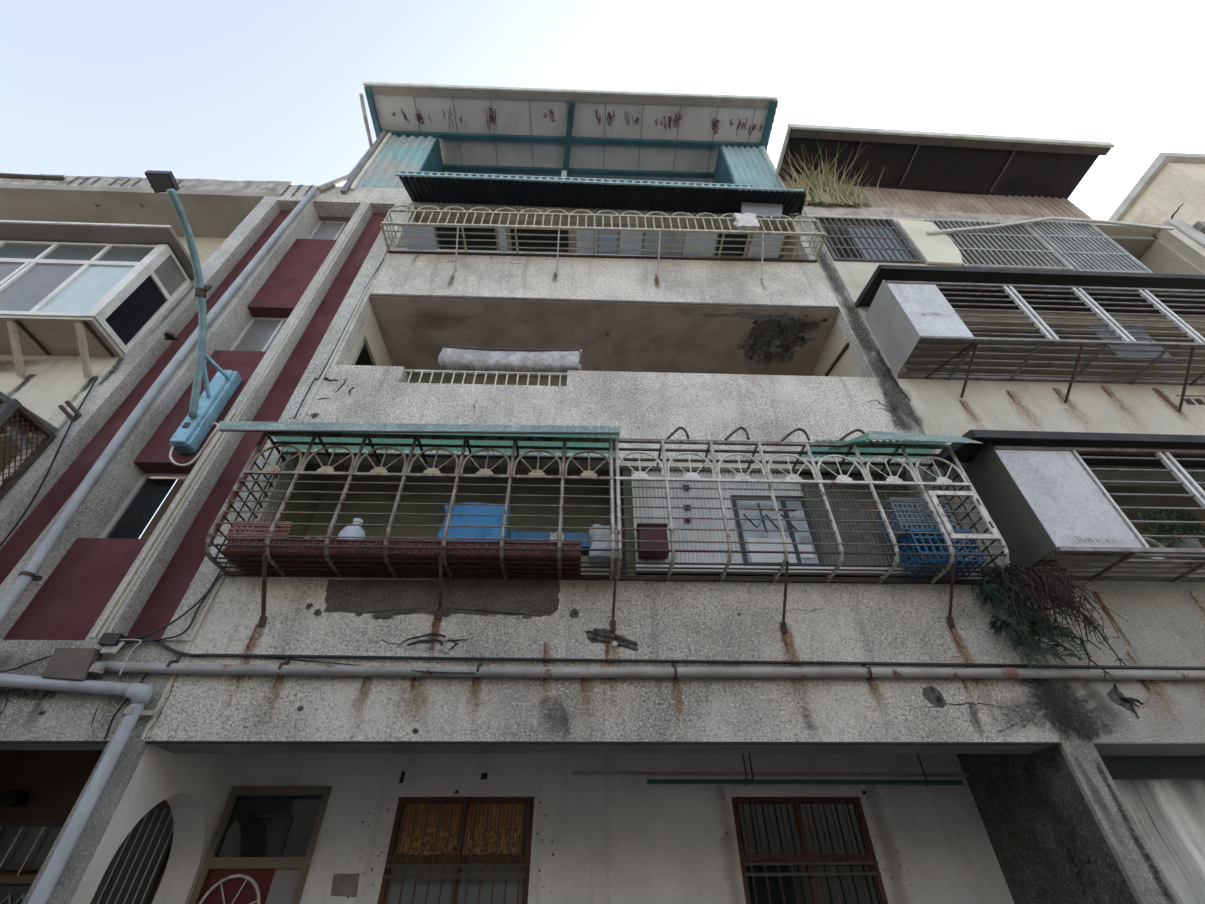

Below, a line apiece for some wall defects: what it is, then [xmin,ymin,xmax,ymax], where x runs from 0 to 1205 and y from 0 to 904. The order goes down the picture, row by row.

corrosion [1153,389,1178,411]
peeling [305,579,638,653]
corrosion [780,628,798,666]
spalling [923,686,947,708]
damp [1000,679,1117,741]
spalling [1107,684,1145,719]